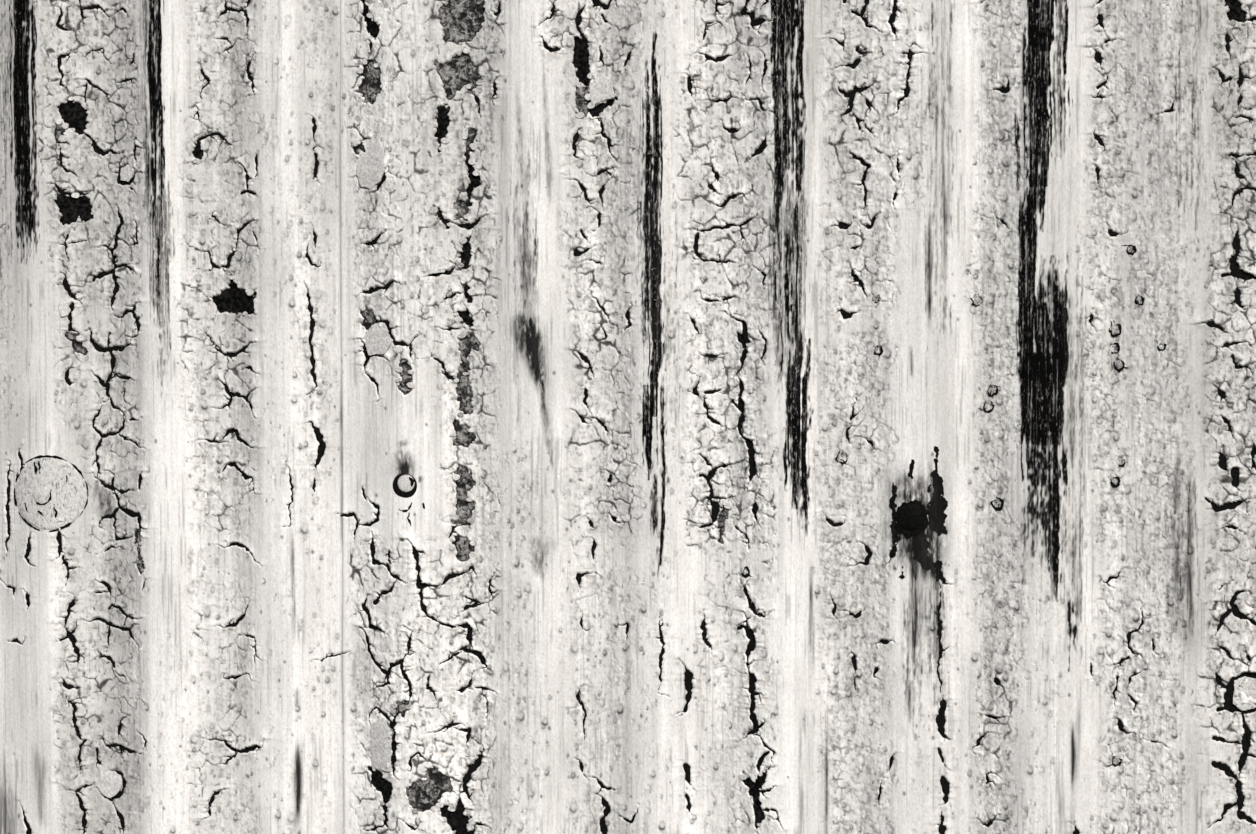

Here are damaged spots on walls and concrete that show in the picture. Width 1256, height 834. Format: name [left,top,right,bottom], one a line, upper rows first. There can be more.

peeling [51,97,89,149]
peeling [428,0,485,229]
crack [0,0,147,834]
peeling [207,274,257,316]
peeling [430,235,480,447]
crack [691,165,767,550]
crack [1199,30,1256,532]
crack [311,477,497,834]
peeling [368,700,472,834]
crack [620,581,783,834]
corrosion [892,474,940,654]
crack [1208,583,1256,828]